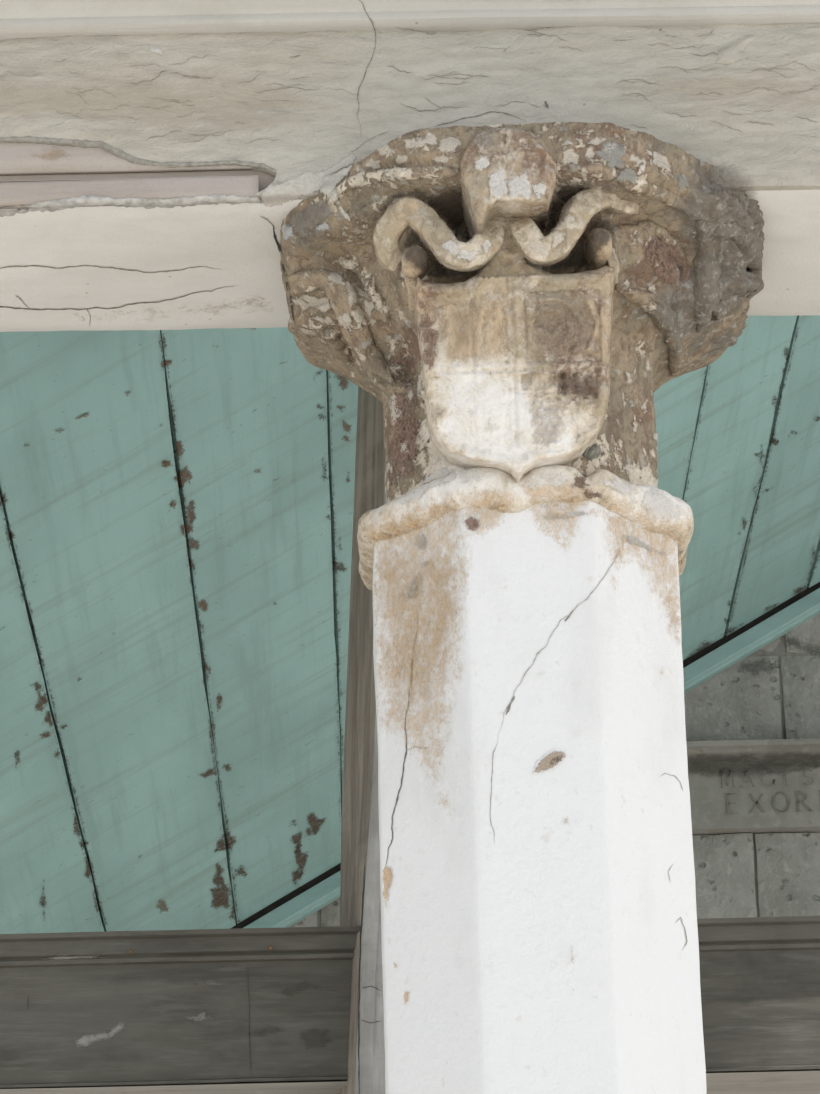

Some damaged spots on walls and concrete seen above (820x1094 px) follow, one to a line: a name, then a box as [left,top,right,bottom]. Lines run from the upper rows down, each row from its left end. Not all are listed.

crack [0,0,584,153]
crack [614,30,820,132]
flaking render [0,136,275,170]
flaking render [0,194,261,217]
crack [0,265,234,325]
peeling [162,441,193,488]
peeling [170,500,200,570]
crack [490,541,624,836]
spalling [532,748,565,773]
peeling [214,831,236,852]
crack [358,615,429,1093]
peeling [210,865,248,921]